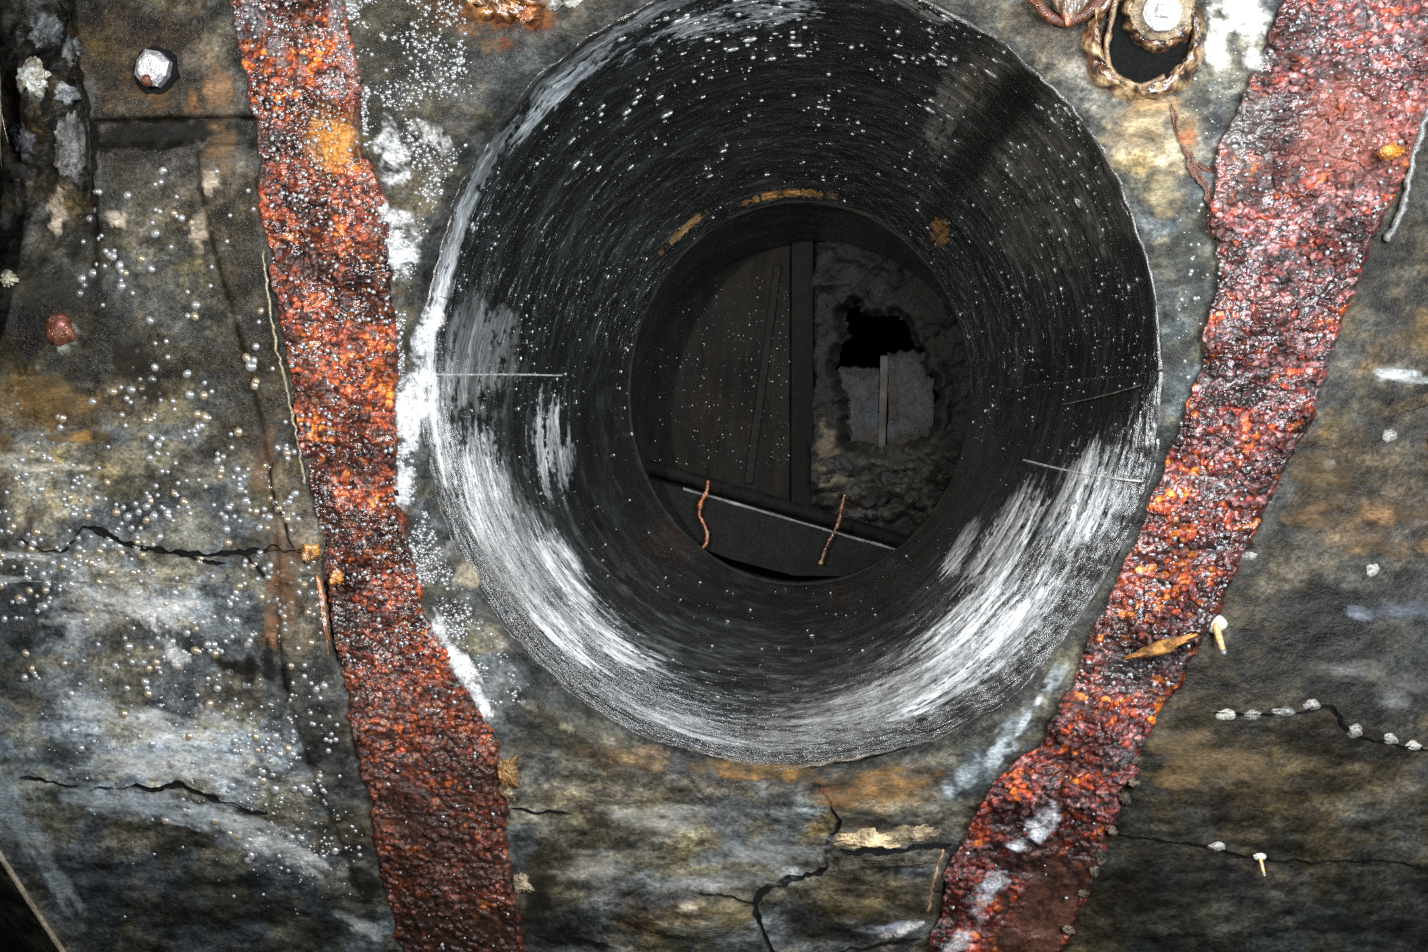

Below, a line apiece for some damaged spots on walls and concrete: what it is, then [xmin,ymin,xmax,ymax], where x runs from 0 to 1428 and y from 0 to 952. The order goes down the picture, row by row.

leakage [515,0,809,138]
leakage [374,128,410,184]
leakage [380,204,417,273]
leakage [394,151,656,674]
crack [20,462,302,586]
rust [190,0,525,952]
rust [927,0,1428,952]
leakage [433,617,493,717]
crack [1214,704,1428,752]
crack [19,776,268,815]
crack [693,784,953,952]
spalling [831,824,943,869]